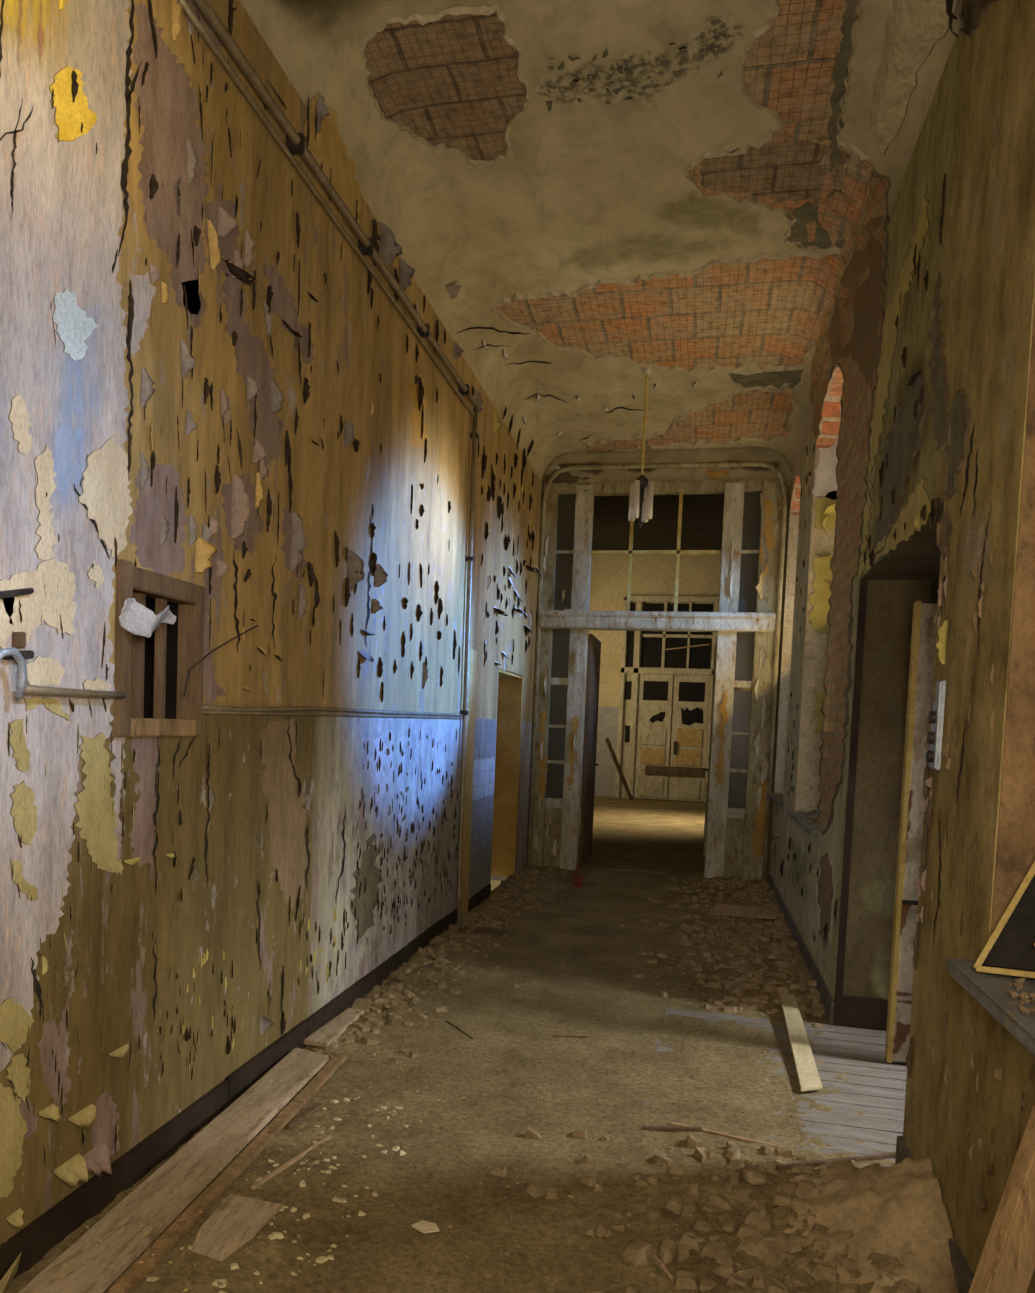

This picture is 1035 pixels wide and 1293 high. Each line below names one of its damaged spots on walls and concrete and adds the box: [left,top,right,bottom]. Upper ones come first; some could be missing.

crack [0,0,8,77]
crack [0,99,34,218]
spalling [359,4,534,165]
peeling [0,0,464,1199]
peeling [912,665,996,970]
peeling [6,1207,24,1228]